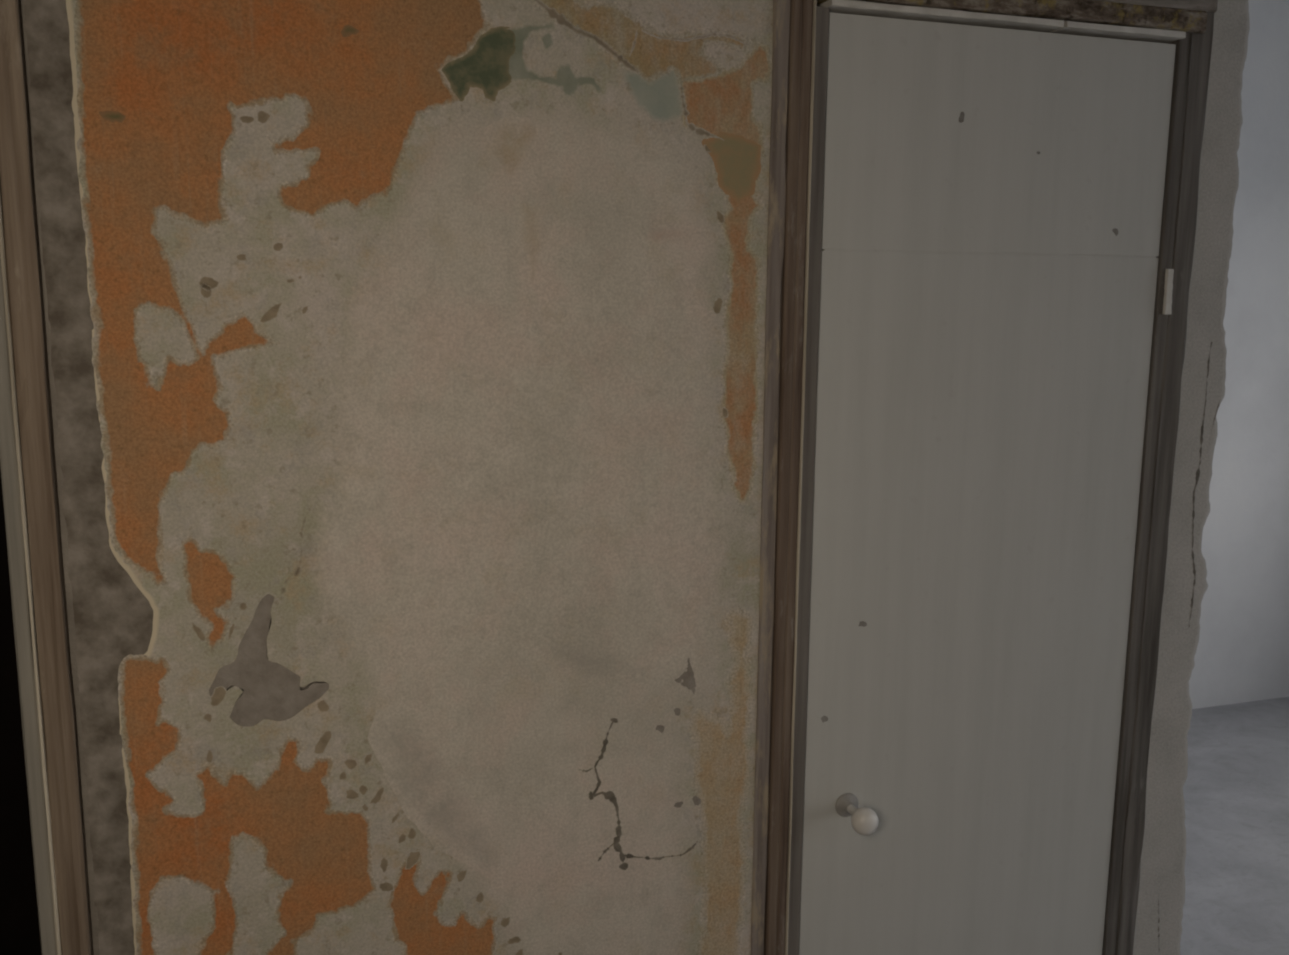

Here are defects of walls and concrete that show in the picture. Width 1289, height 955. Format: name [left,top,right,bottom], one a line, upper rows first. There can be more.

peeling [442,21,603,102]
peeling [239,110,271,125]
peeling [199,275,220,299]
spalling [23,0,153,955]
spalling [203,594,330,727]
spalling [675,658,696,694]
peeling [314,730,332,754]
peeling [338,753,385,812]
crack [578,717,698,870]